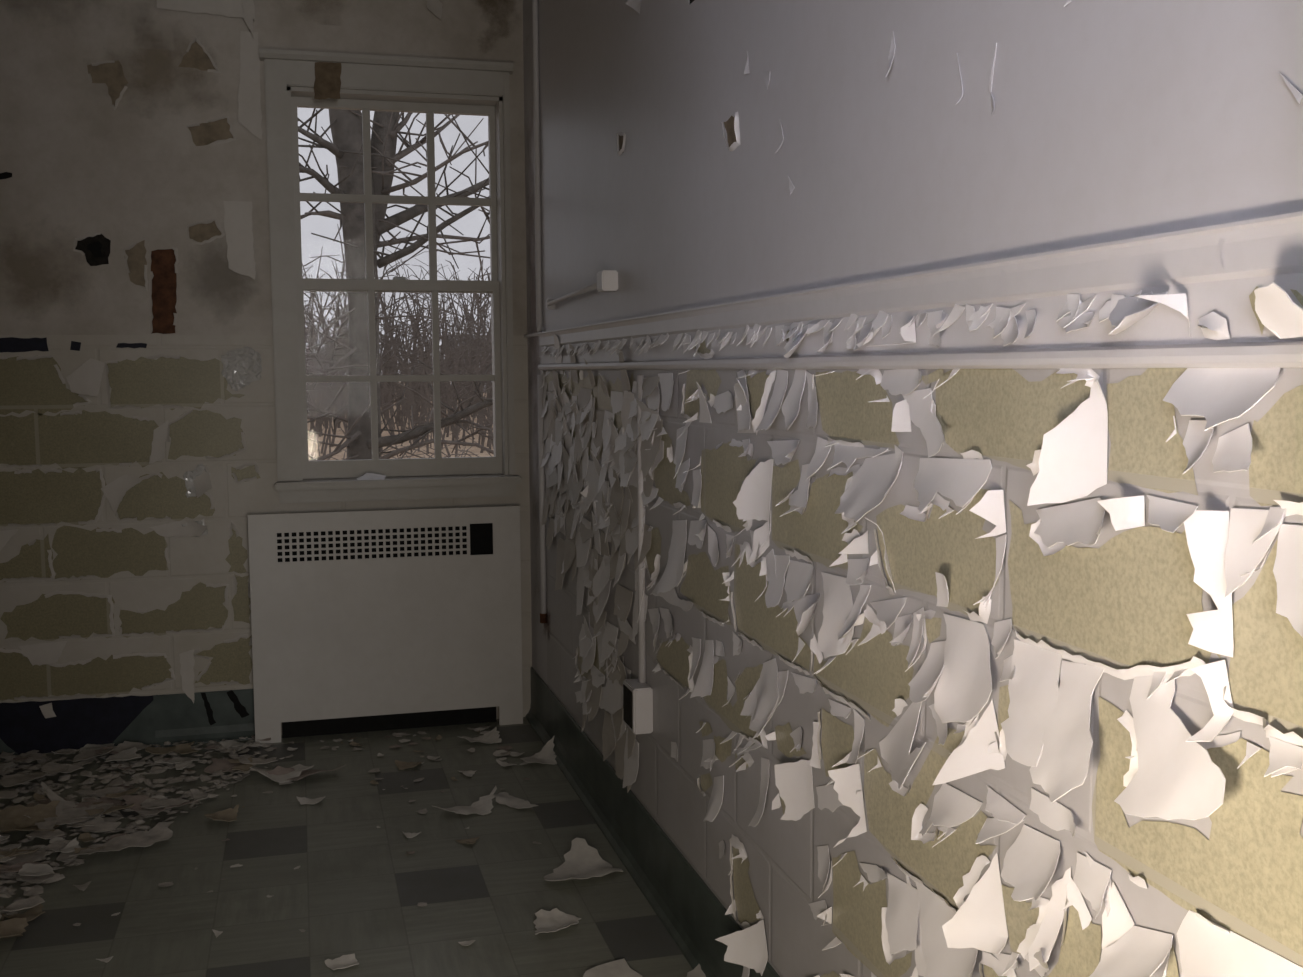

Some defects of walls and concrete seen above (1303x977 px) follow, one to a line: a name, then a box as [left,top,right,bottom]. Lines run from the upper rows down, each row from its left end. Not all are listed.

flaking render [87,60,128,110]
peeling [0,354,261,704]
peeling [533,282,1303,977]